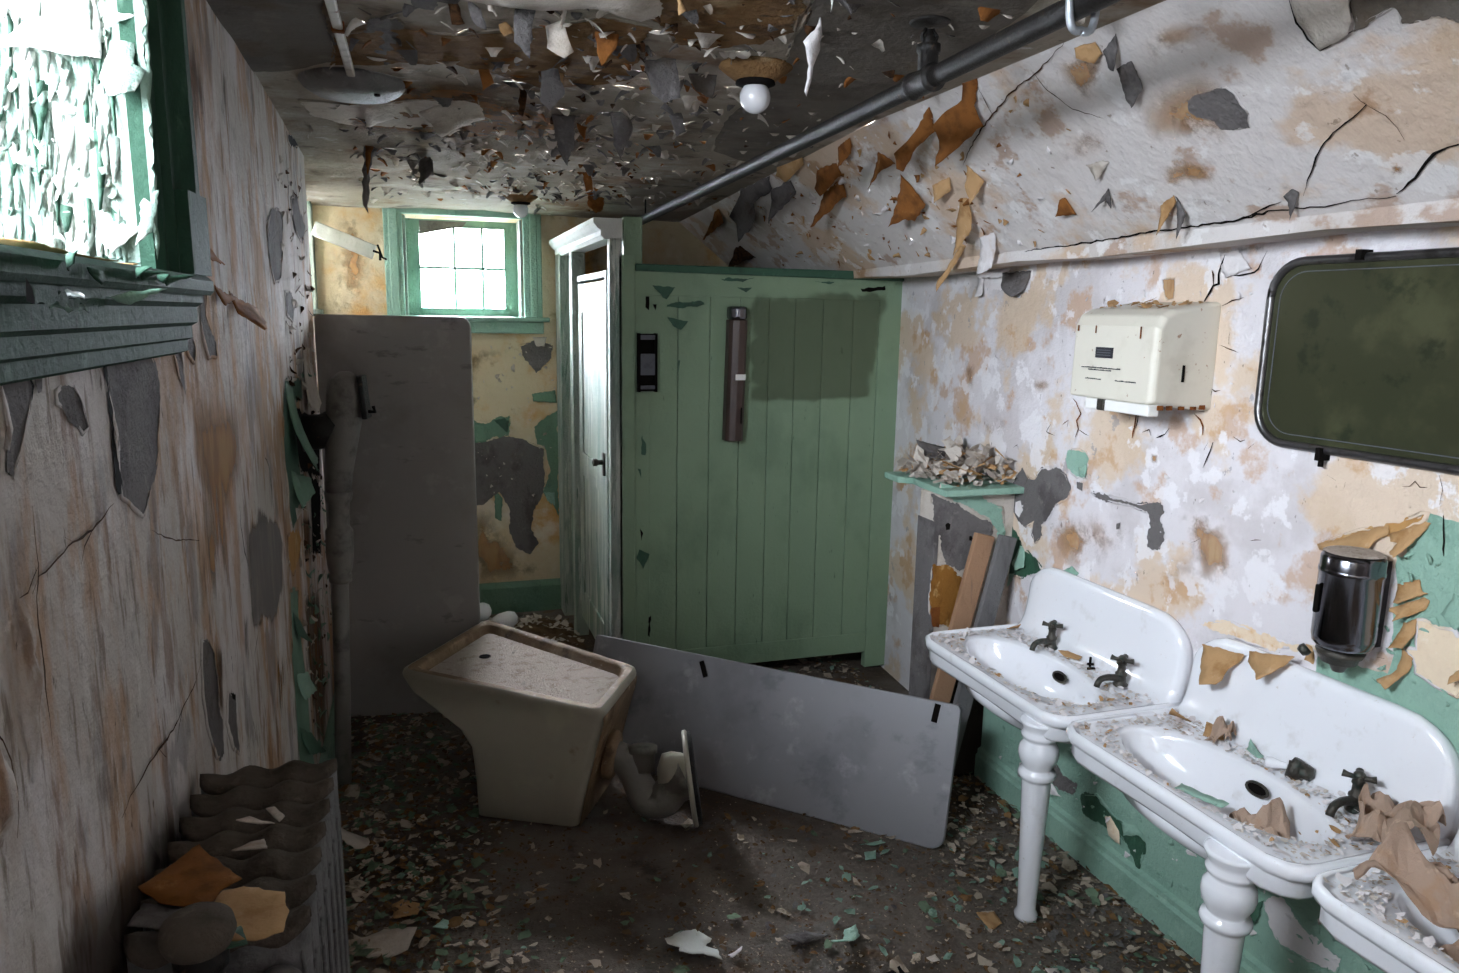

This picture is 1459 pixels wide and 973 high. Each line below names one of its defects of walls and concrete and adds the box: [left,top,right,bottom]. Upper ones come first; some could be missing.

peeling [0,0,195,313]
crack [1025,101,1459,352]
spalling [0,378,89,479]
crack [20,504,113,745]
spalling [104,358,161,519]
crack [152,530,199,541]
spalling [249,0,1033,764]
spalling [929,448,1174,587]
peeling [1199,619,1317,685]
peeling [1317,511,1459,707]
crack [0,736,19,838]
crack [122,660,202,817]